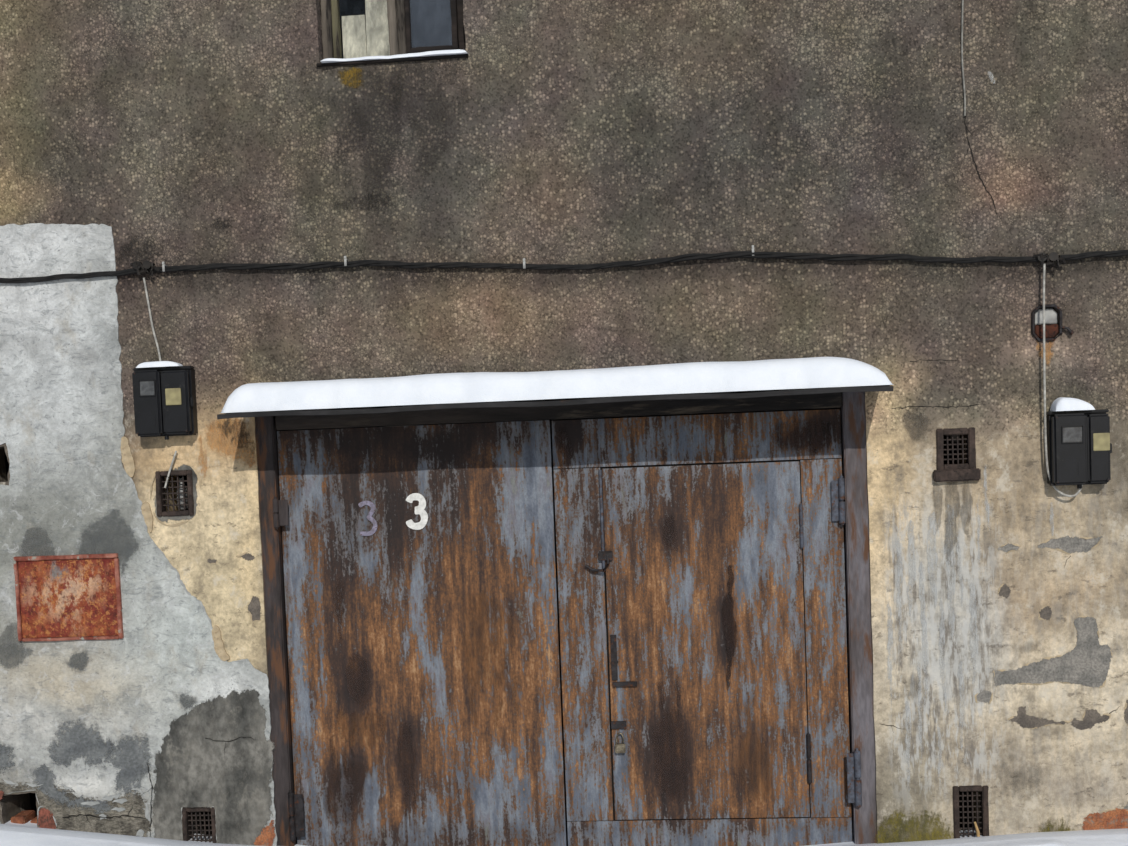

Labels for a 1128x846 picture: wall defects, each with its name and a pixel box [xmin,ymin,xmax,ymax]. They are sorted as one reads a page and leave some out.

crack [961,92,998,218]
flaking render [121,436,201,532]
peeling [1038,536,1103,554]
peeling [157,547,246,662]
peeling [248,596,261,623]
leakage [887,505,978,756]
peeling [998,584,1011,597]
peeling [974,615,1113,704]
peeling [1007,700,1128,730]
flaking render [0,779,151,837]
flaking render [254,820,276,846]
flaking render [1083,804,1128,830]